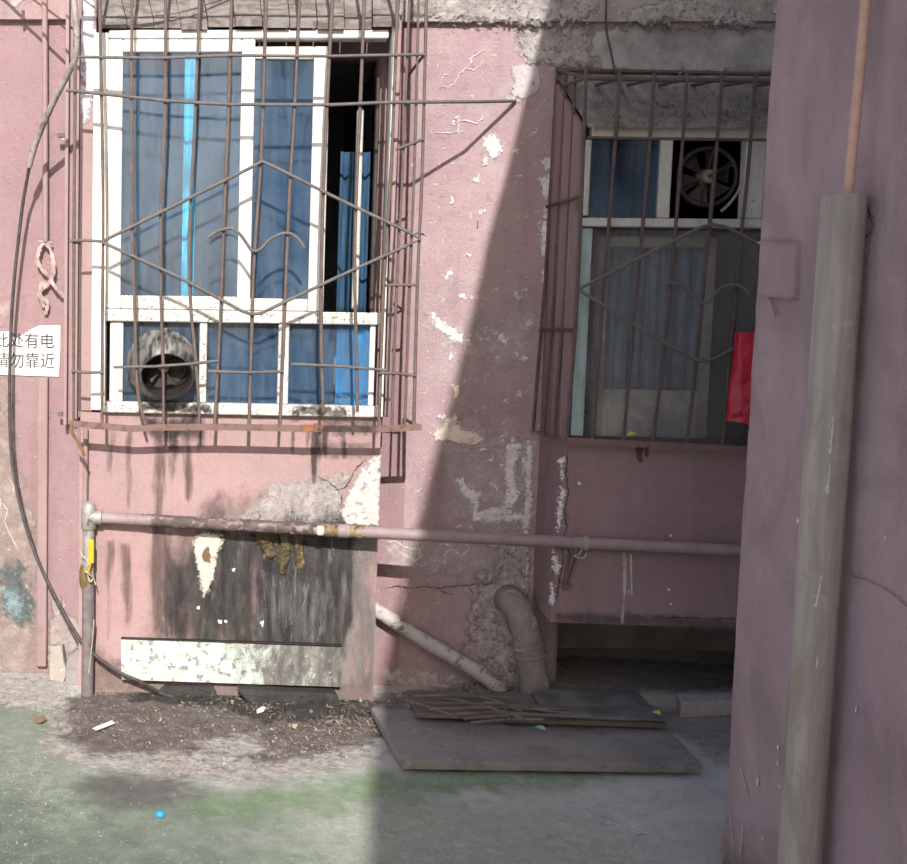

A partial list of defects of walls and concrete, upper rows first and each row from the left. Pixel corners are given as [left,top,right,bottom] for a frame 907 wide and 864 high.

flaking render [411,0,775,106]
peeling [473,134,519,183]
peeling [536,157,551,284]
peeling [428,311,528,362]
leakage [145,416,204,515]
leakage [240,432,352,524]
peeling [340,455,381,526]
leakage [108,546,130,605]
peeling [192,532,224,597]
leakage [152,527,376,700]
crack [390,583,477,598]
leakage [94,661,242,696]